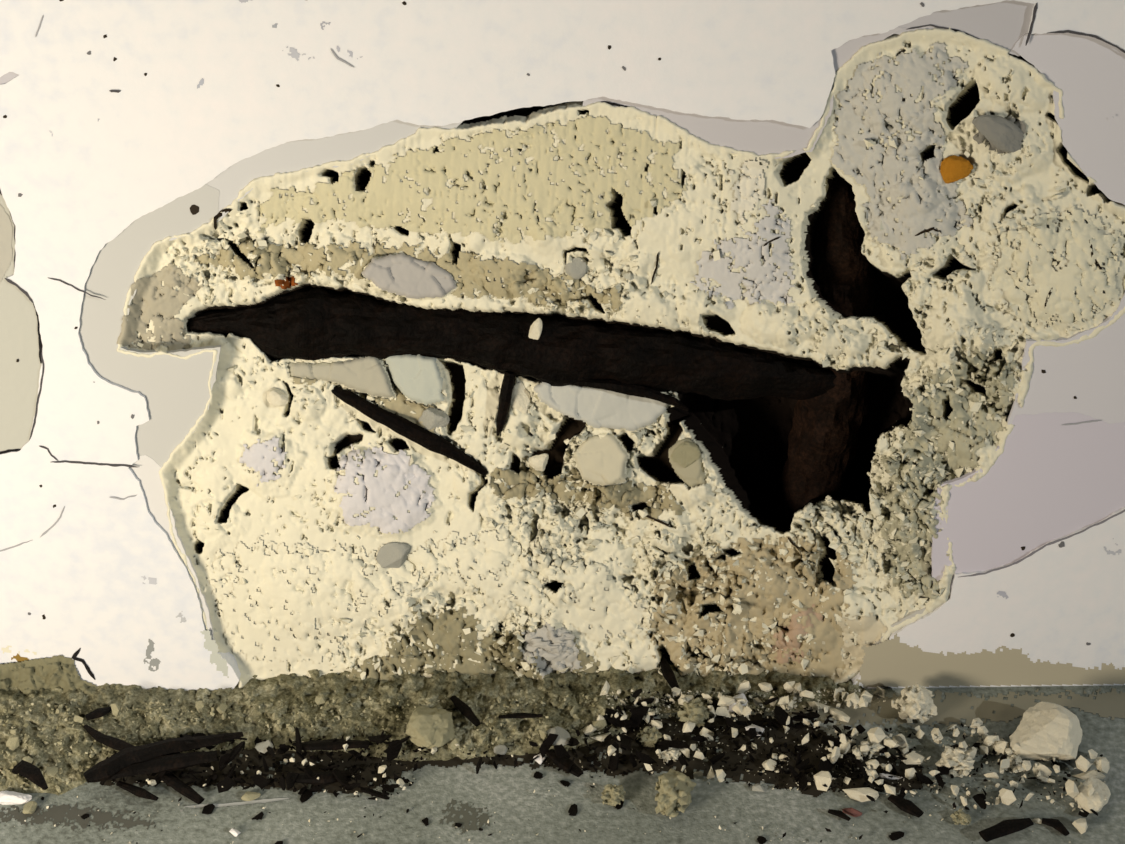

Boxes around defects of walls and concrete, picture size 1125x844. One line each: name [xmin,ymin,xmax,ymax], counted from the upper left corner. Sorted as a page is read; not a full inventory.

crack [908,24,979,39]
crack [1026,3,1125,53]
peeling [0,72,18,84]
crack [1089,240,1105,275]
corrosion [275,276,298,289]
peeling [0,194,43,452]
spalling [79,0,1125,688]
crack [1063,418,1102,426]
crack [0,506,65,552]
crack [961,510,1125,577]
crack [72,648,95,680]